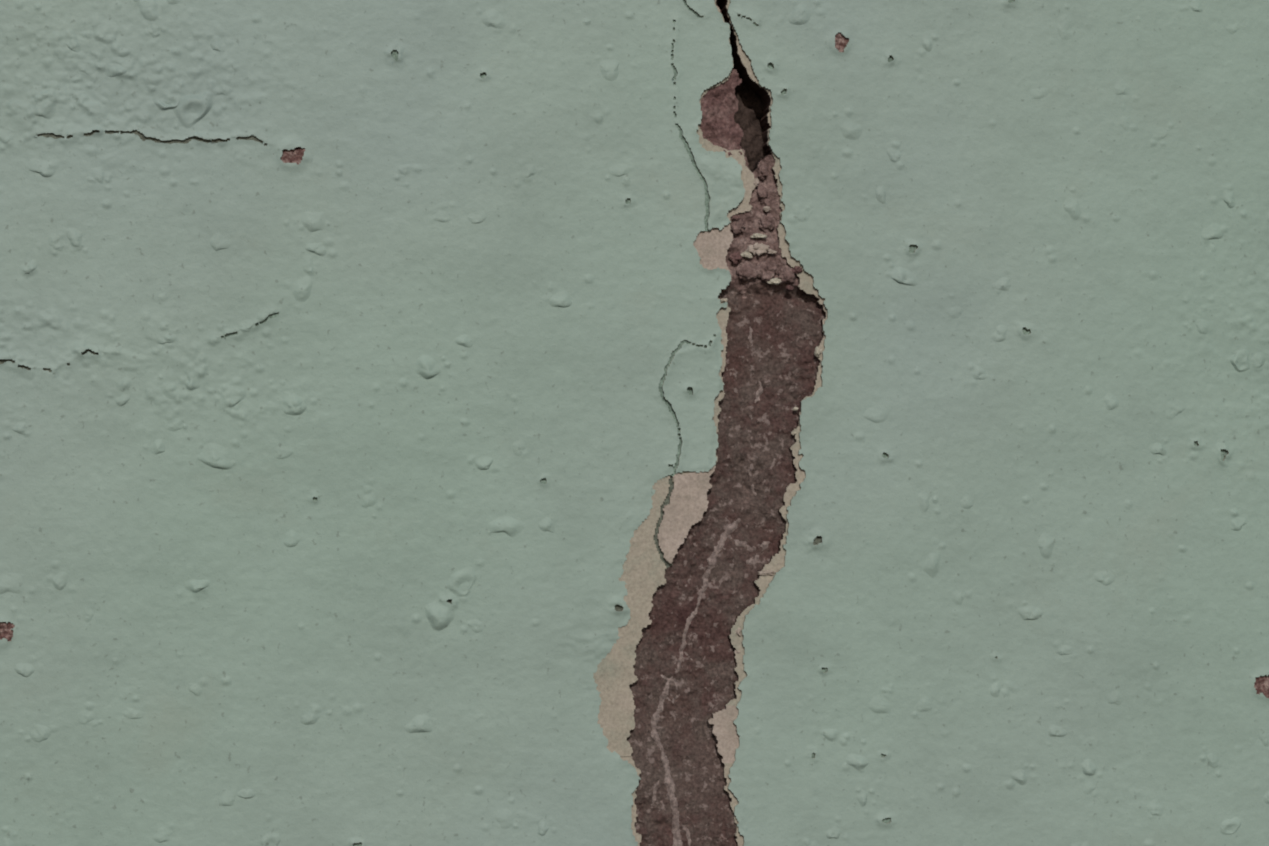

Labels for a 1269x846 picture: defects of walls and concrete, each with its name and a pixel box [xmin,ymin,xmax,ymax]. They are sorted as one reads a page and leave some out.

crack [38,130,267,146]
corrosion [273,147,305,164]
peeling [693,224,734,272]
crack [0,349,99,372]
crack [620,0,827,846]
peeling [593,464,716,756]
corrosion [0,622,15,641]
corrosion [1254,675,1269,698]
peeling [707,705,739,763]